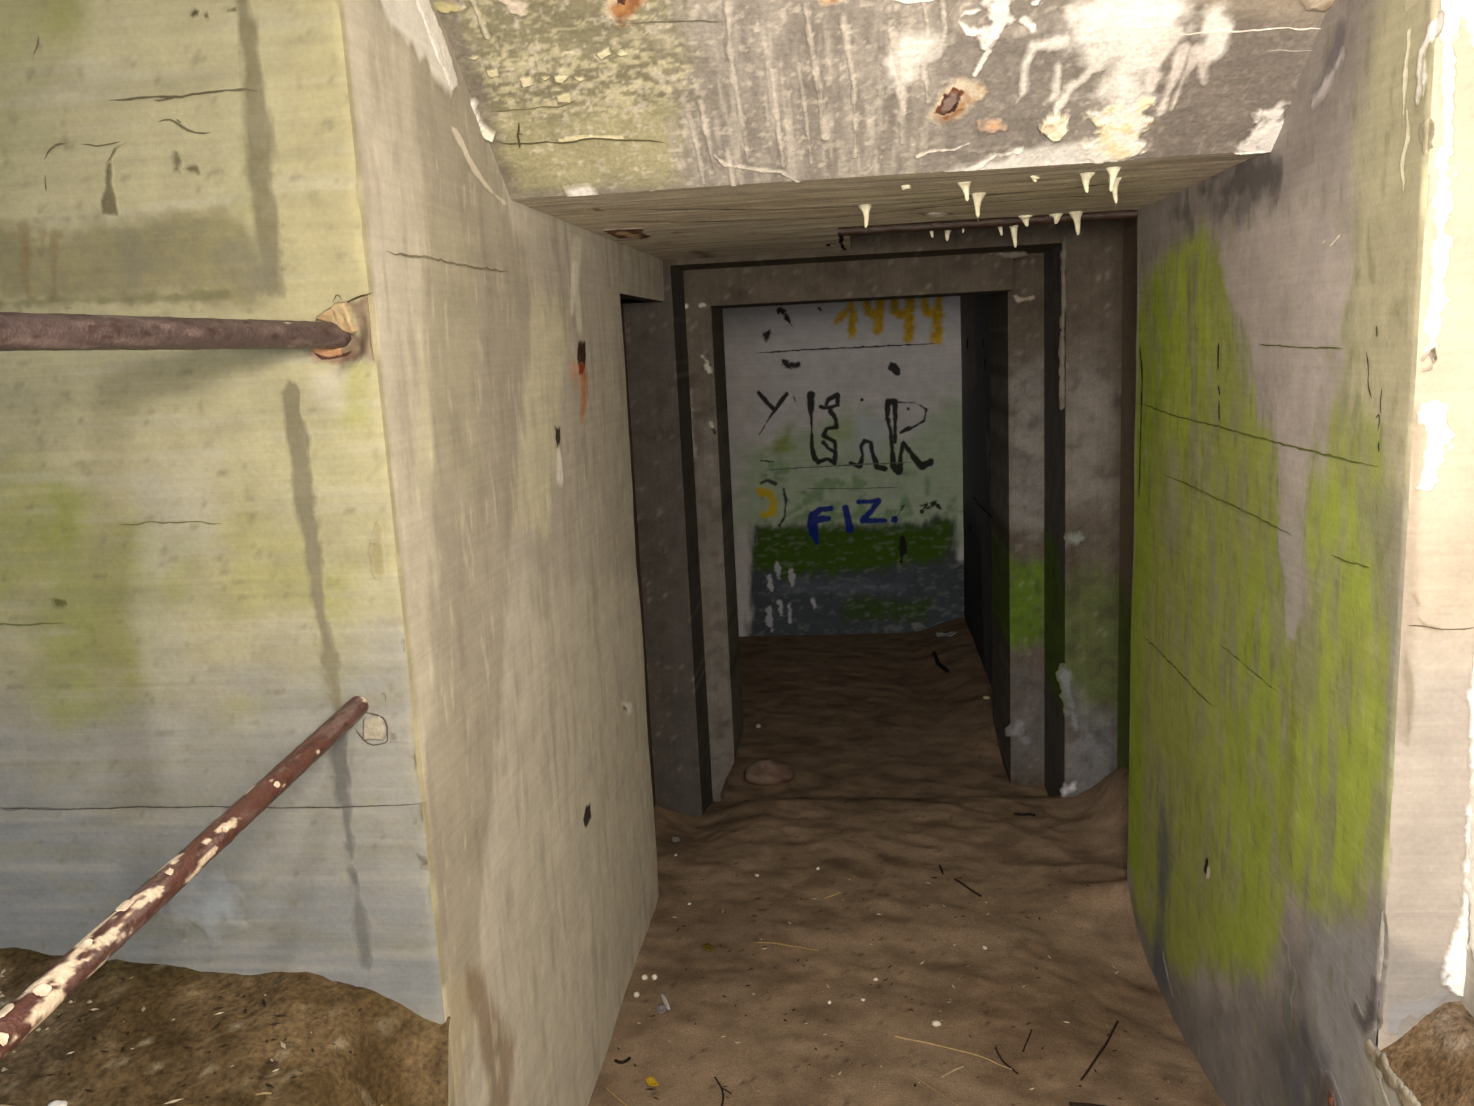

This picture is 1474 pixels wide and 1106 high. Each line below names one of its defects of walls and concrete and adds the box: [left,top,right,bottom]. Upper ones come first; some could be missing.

water stain [0,0,289,318]
crack [115,88,256,134]
rust [596,0,658,31]
rust [924,68,991,127]
water stain [838,0,1238,201]
water stain [1400,0,1474,354]
water stain [1169,0,1366,871]
water stain [278,376,347,714]
crack [0,804,229,812]
crack [267,802,420,810]
water stain [1438,652,1474,998]
water stain [1350,910,1389,1039]